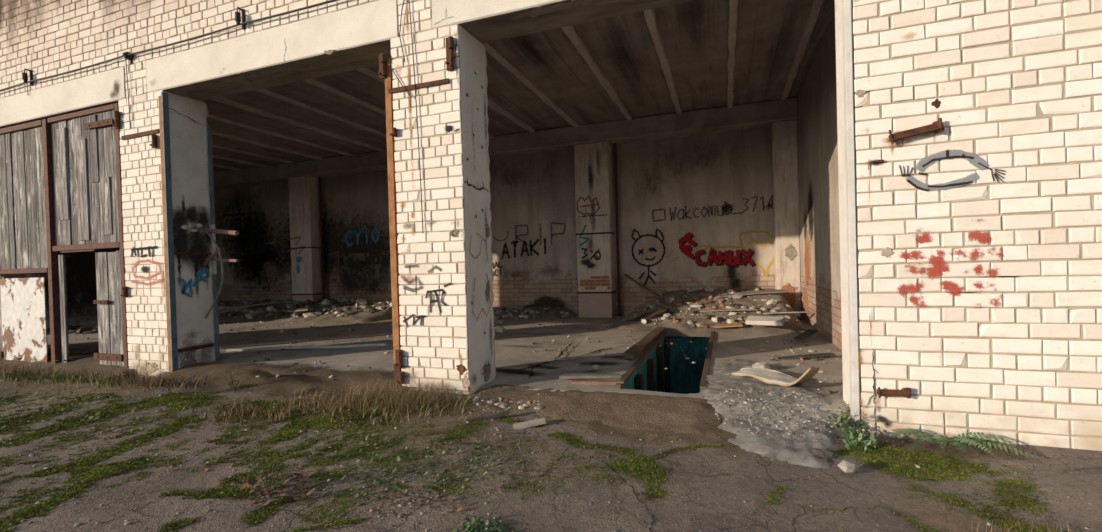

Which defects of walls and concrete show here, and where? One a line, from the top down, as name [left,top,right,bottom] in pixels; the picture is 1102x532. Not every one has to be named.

leakage [217,196,280,282]
crack [88,493,381,532]